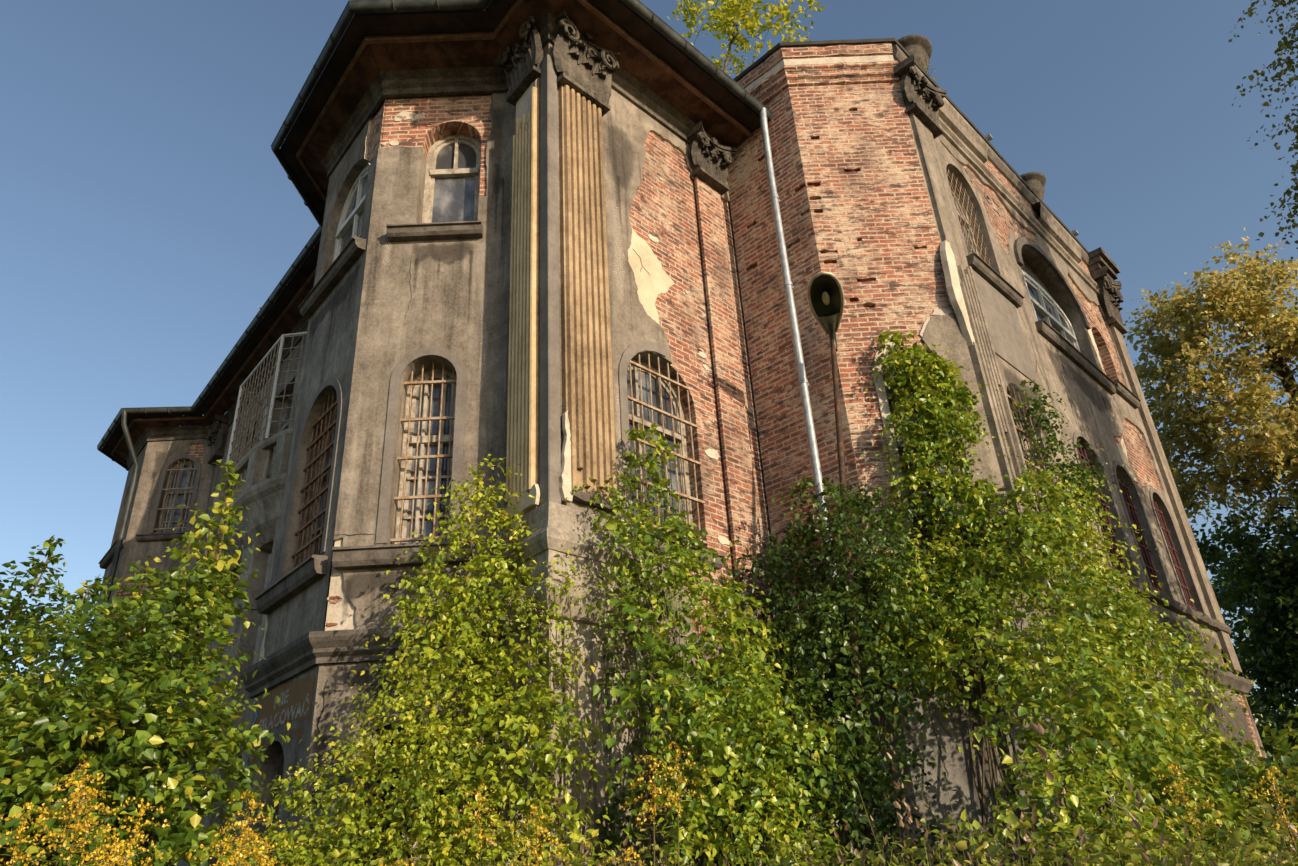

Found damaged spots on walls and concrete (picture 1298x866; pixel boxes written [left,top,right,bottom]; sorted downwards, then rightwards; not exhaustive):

spalling [364,116,399,165]
peeling [394,111,426,122]